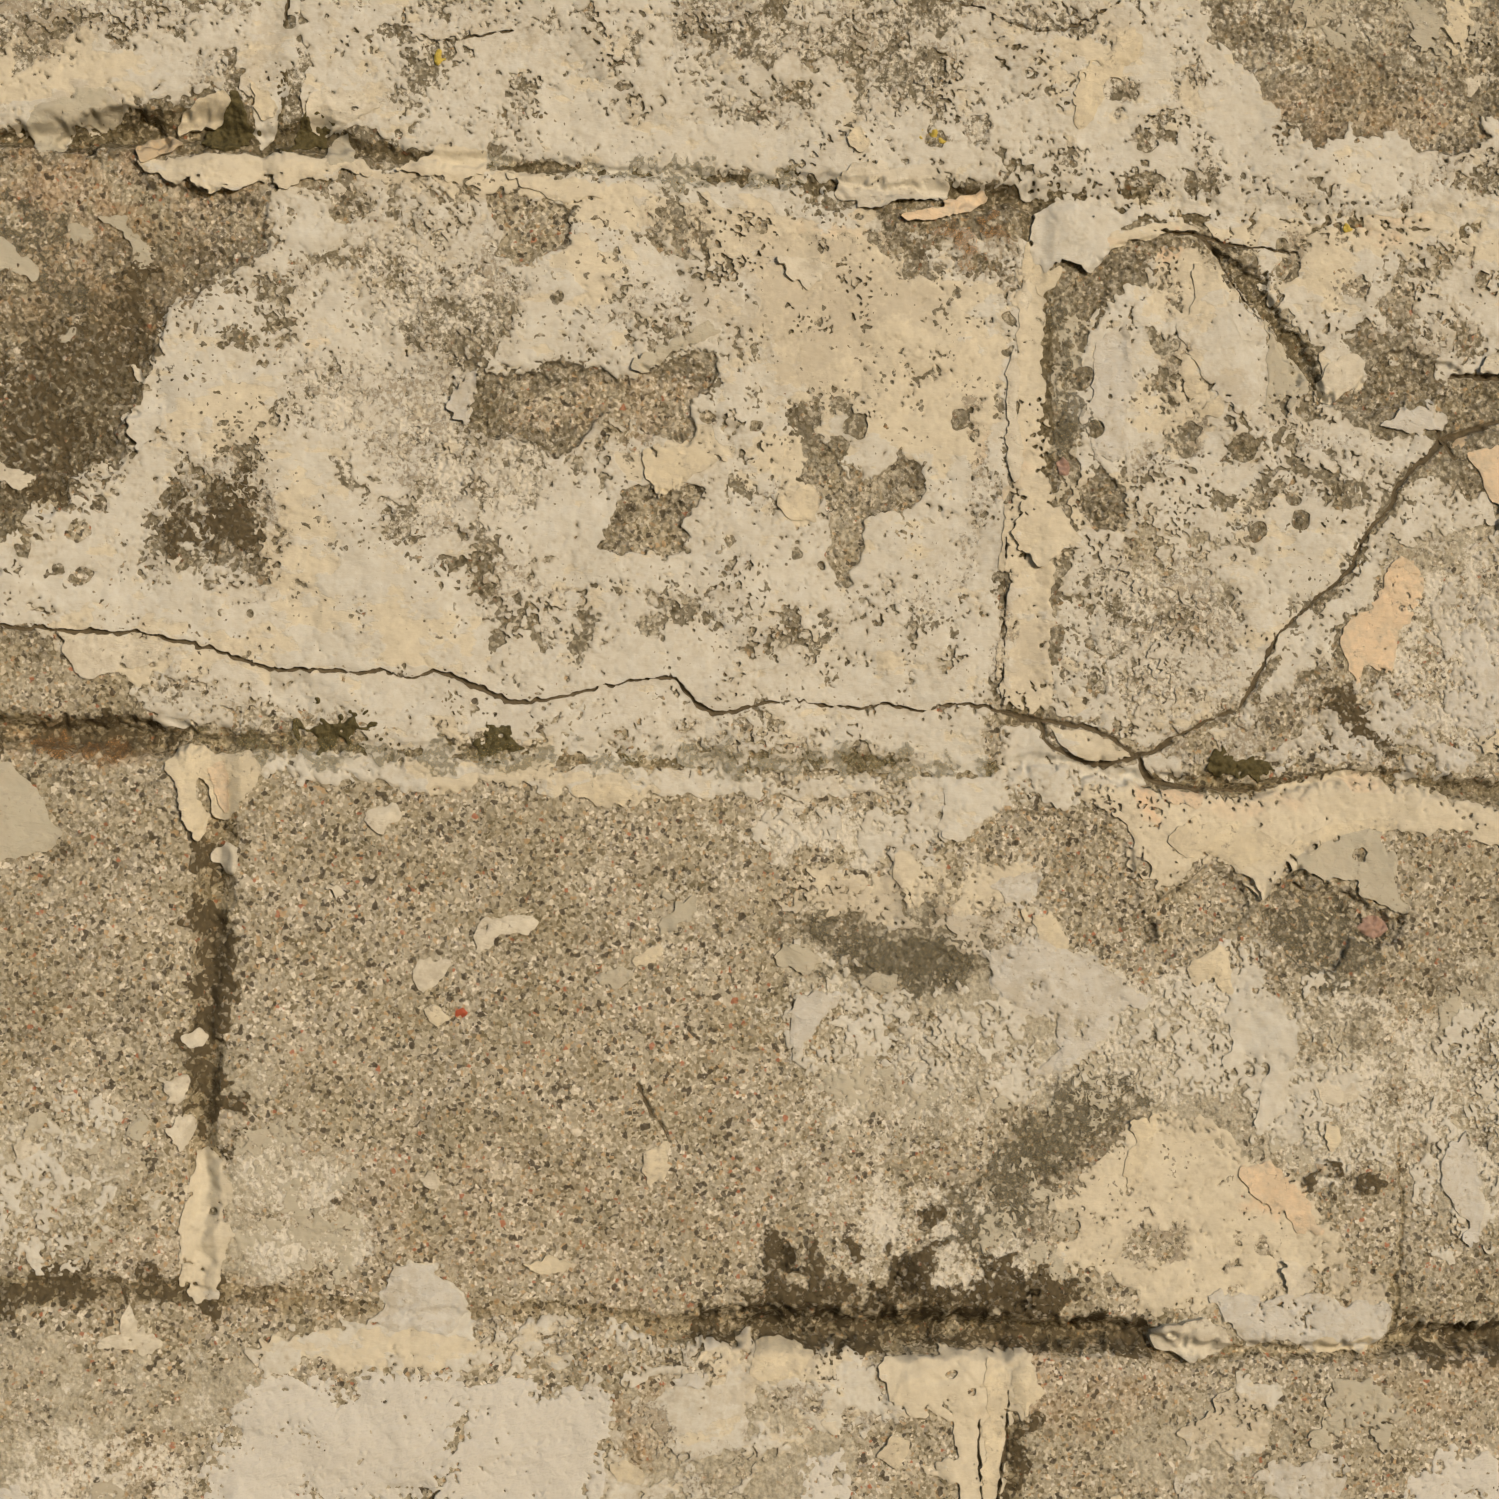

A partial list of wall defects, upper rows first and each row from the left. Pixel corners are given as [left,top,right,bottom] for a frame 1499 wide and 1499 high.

crack [1161,229,1295,313]
crack [1448,373,1499,381]
crack [0,420,1499,792]
peeling [211,842,238,875]
peeling [473,915,539,953]
damp [168,835,251,1160]
damp [737,1072,1168,1341]
peeling [97,1305,163,1356]
peeling [197,1259,1045,1499]
peeling [1147,1317,1233,1363]
peeling [1174,1370,1407,1499]
peeling [1404,1444,1499,1499]